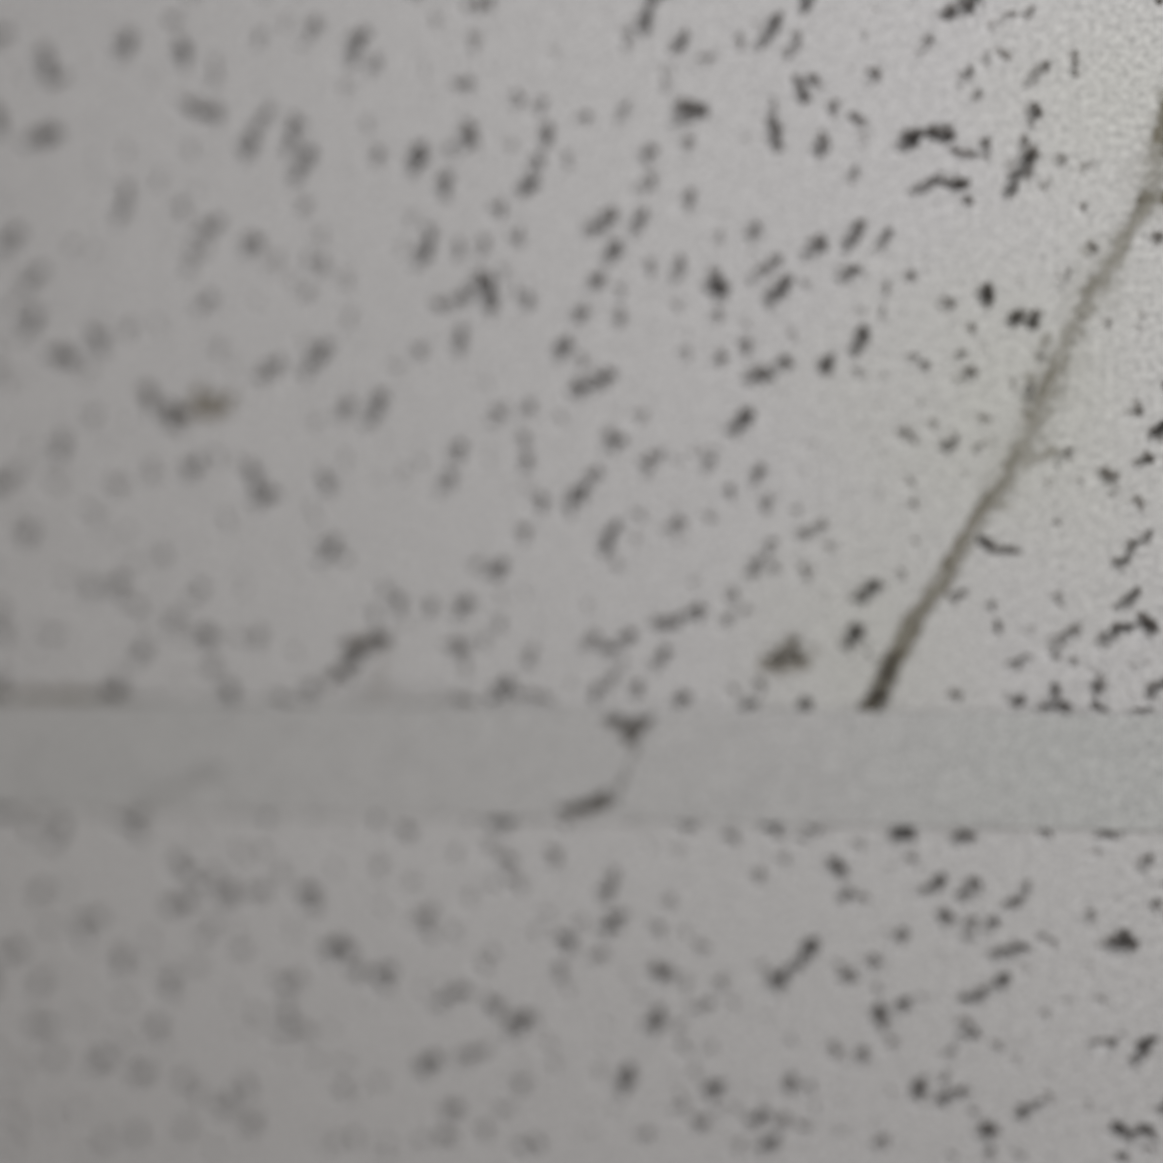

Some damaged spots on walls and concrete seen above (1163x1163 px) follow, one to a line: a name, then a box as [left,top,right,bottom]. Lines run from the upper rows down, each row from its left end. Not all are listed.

crack [859,533,965,712]